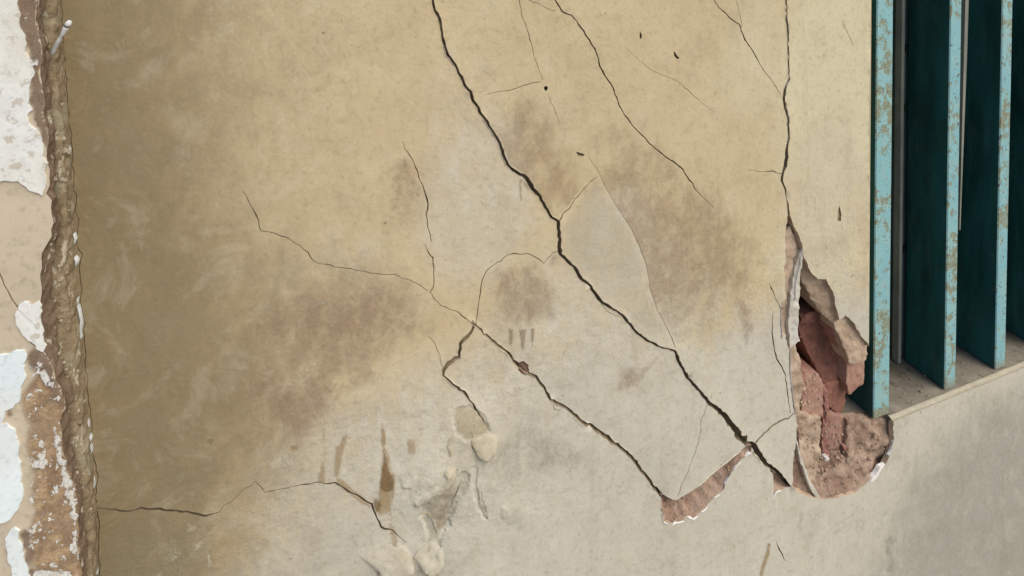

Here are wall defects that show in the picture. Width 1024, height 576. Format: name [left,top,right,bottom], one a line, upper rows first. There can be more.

spalling [0,0,99,576]
crack [60,1,406,576]
flaking render [362,541,445,576]
flaking render [444,409,498,518]
crack [242,0,793,518]
spalling [657,440,752,525]
spalling [769,214,895,499]